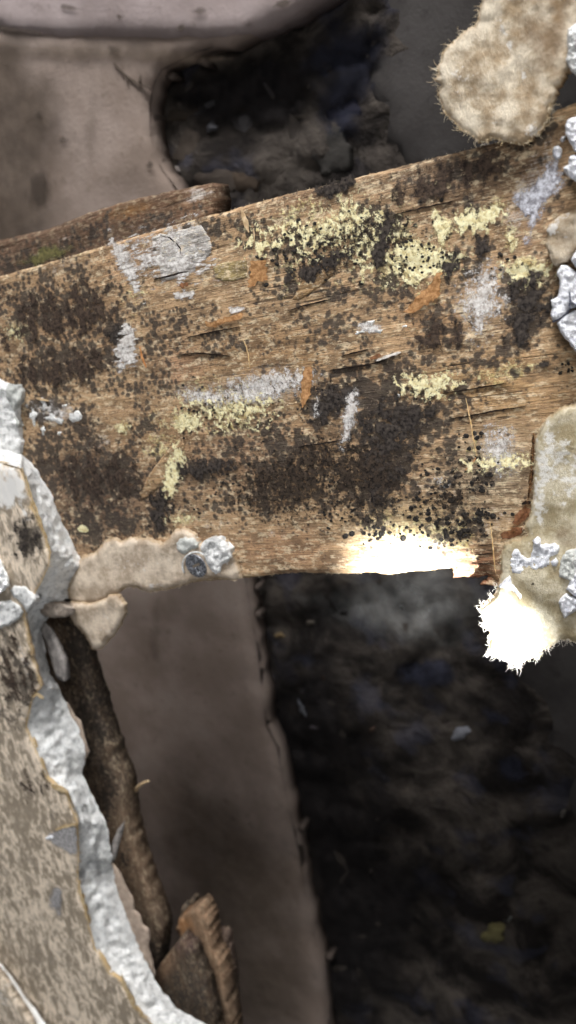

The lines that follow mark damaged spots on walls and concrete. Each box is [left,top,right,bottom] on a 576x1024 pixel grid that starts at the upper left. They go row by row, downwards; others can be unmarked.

leakage [234,147,559,355]
leakage [0,278,130,392]
leakage [537,359,574,375]
leakage [36,366,534,550]
leakage [11,516,41,559]
peeling [559,548,576,581]